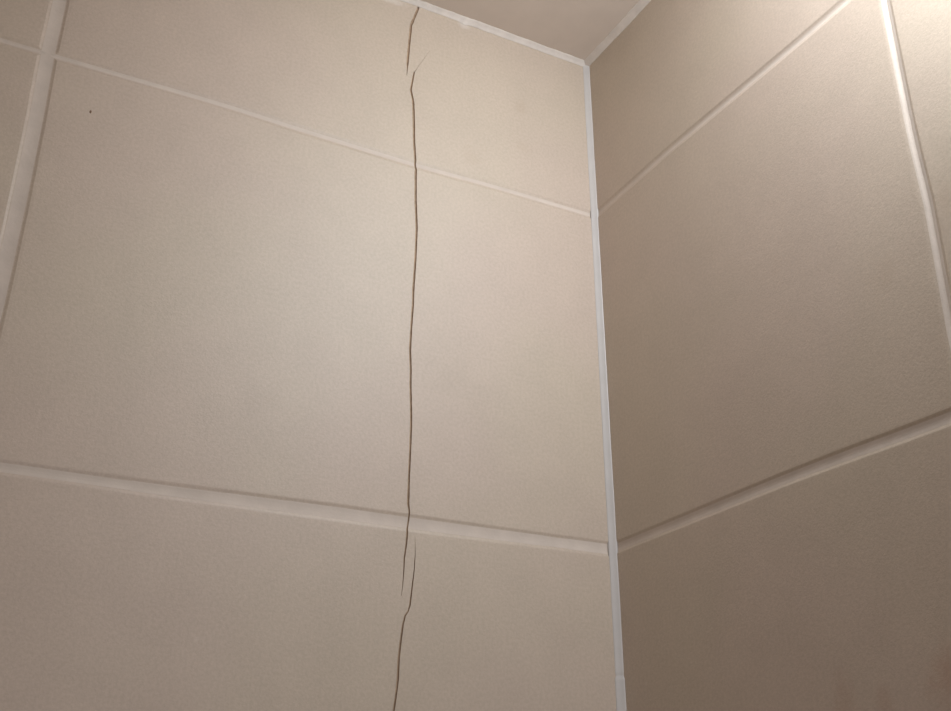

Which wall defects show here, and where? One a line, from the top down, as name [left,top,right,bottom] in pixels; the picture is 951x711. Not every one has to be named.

crack [393,7,426,711]